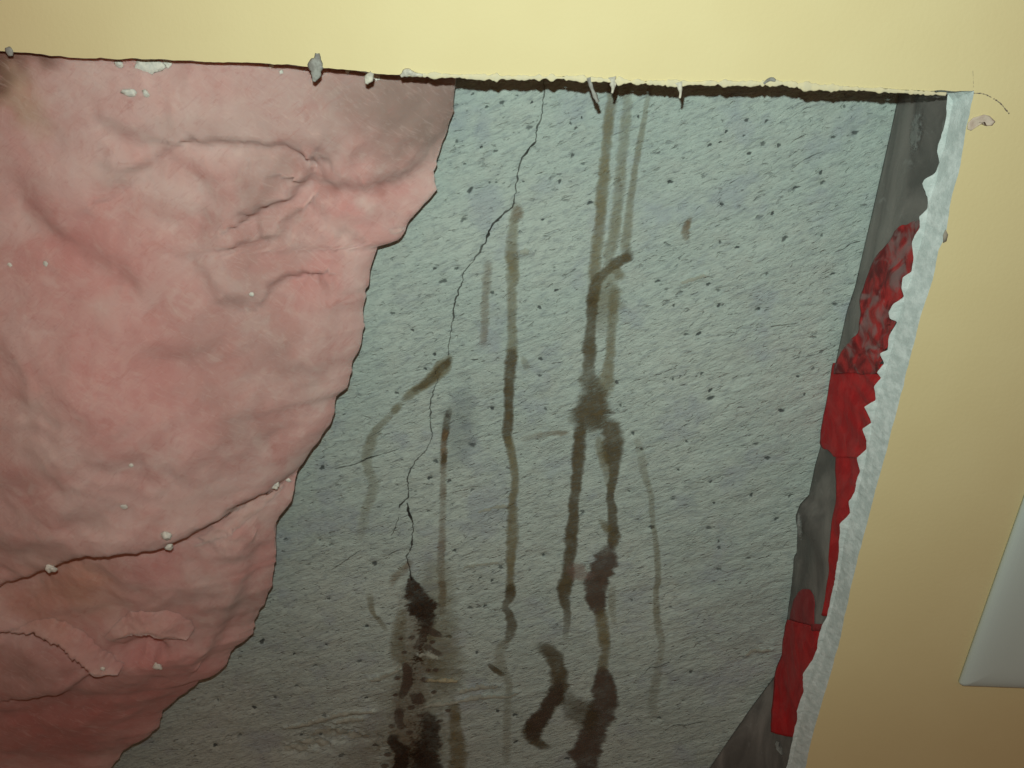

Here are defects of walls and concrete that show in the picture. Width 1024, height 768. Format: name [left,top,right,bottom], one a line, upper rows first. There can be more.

crack [453,123,539,320]
leakage [507,252,517,282]
crack [399,397,433,578]
leakage [410,359,450,395]
leakage [503,349,518,636]
leakage [523,109,631,768]
leakage [381,578,466,768]